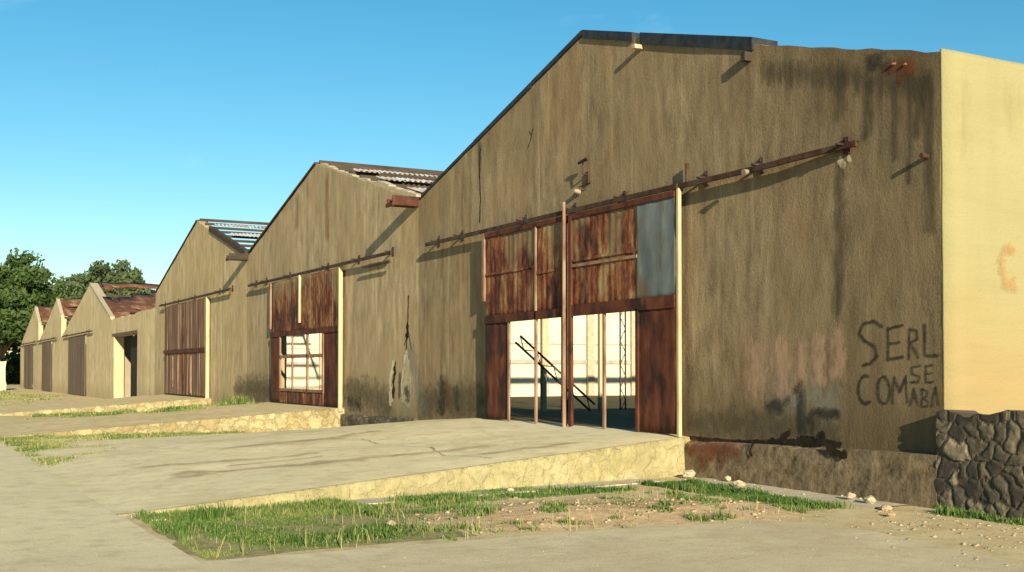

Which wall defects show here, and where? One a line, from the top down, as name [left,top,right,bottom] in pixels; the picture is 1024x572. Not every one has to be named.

crack [404,295,412,350]
peeling [389,350,423,409]